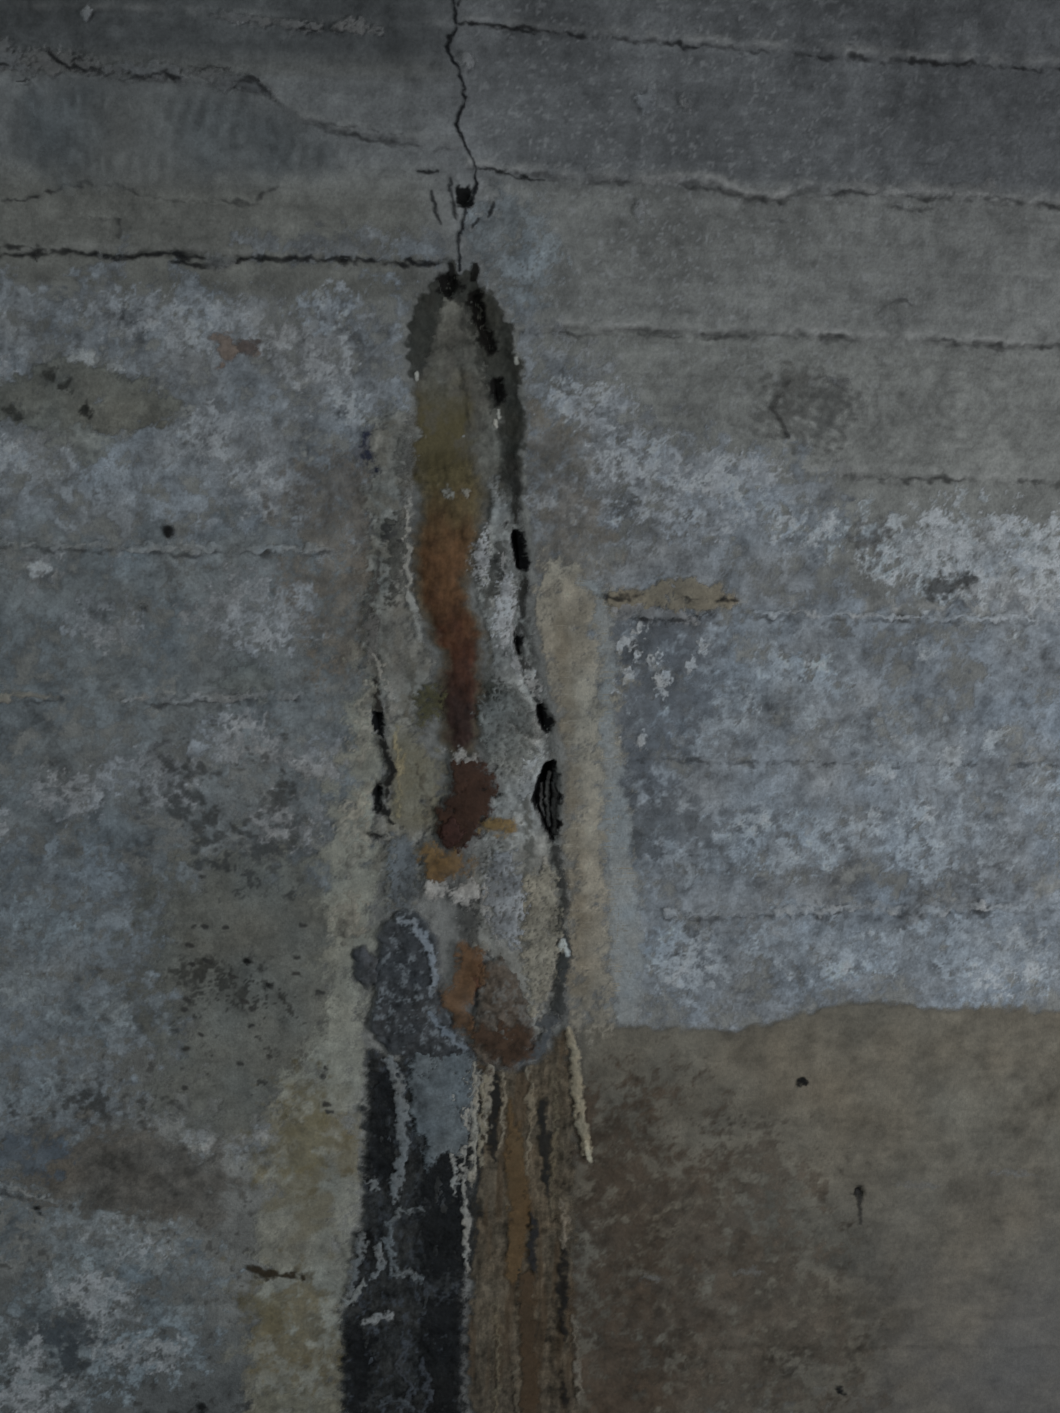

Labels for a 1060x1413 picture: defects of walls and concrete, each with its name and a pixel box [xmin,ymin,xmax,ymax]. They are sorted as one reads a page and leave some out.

crack [4,0,585,272]
crack [665,40,698,50]
crack [910,57,973,67]
spalling [405,260,526,511]
water stain [462,190,561,415]
rust [412,454,517,906]
water stain [523,638,534,657]
rust [441,941,489,1039]